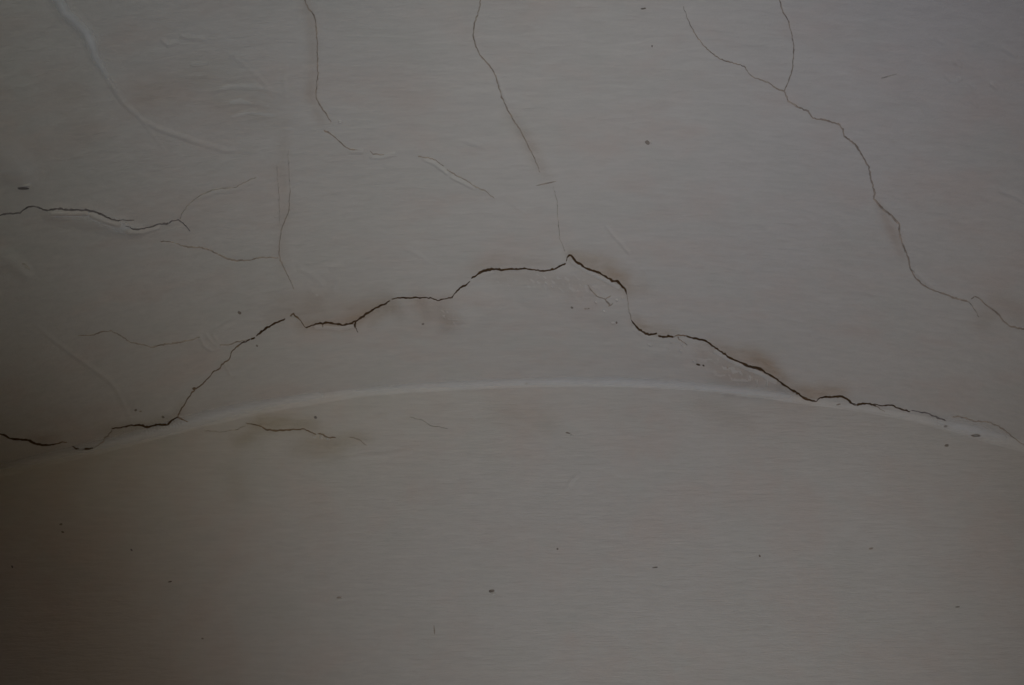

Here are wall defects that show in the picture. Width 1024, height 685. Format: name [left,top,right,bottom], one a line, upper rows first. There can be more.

crack [0,0,1024,450]